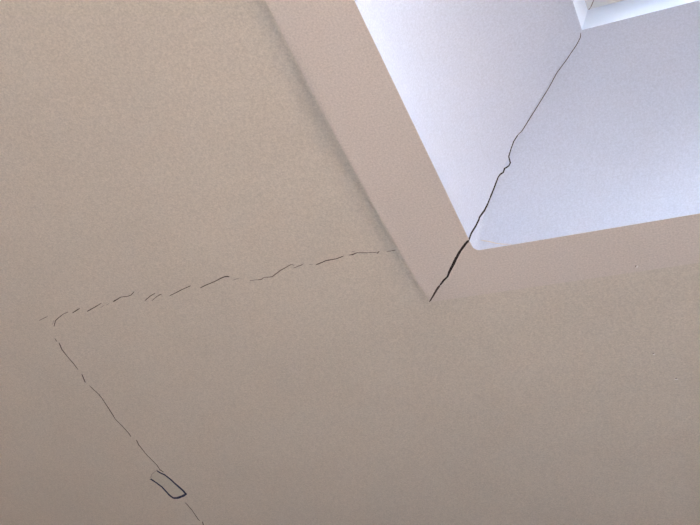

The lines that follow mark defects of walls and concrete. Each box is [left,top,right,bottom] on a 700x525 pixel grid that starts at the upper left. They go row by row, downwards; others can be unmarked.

crack [429,33,581,302]
crack [39,250,395,472]